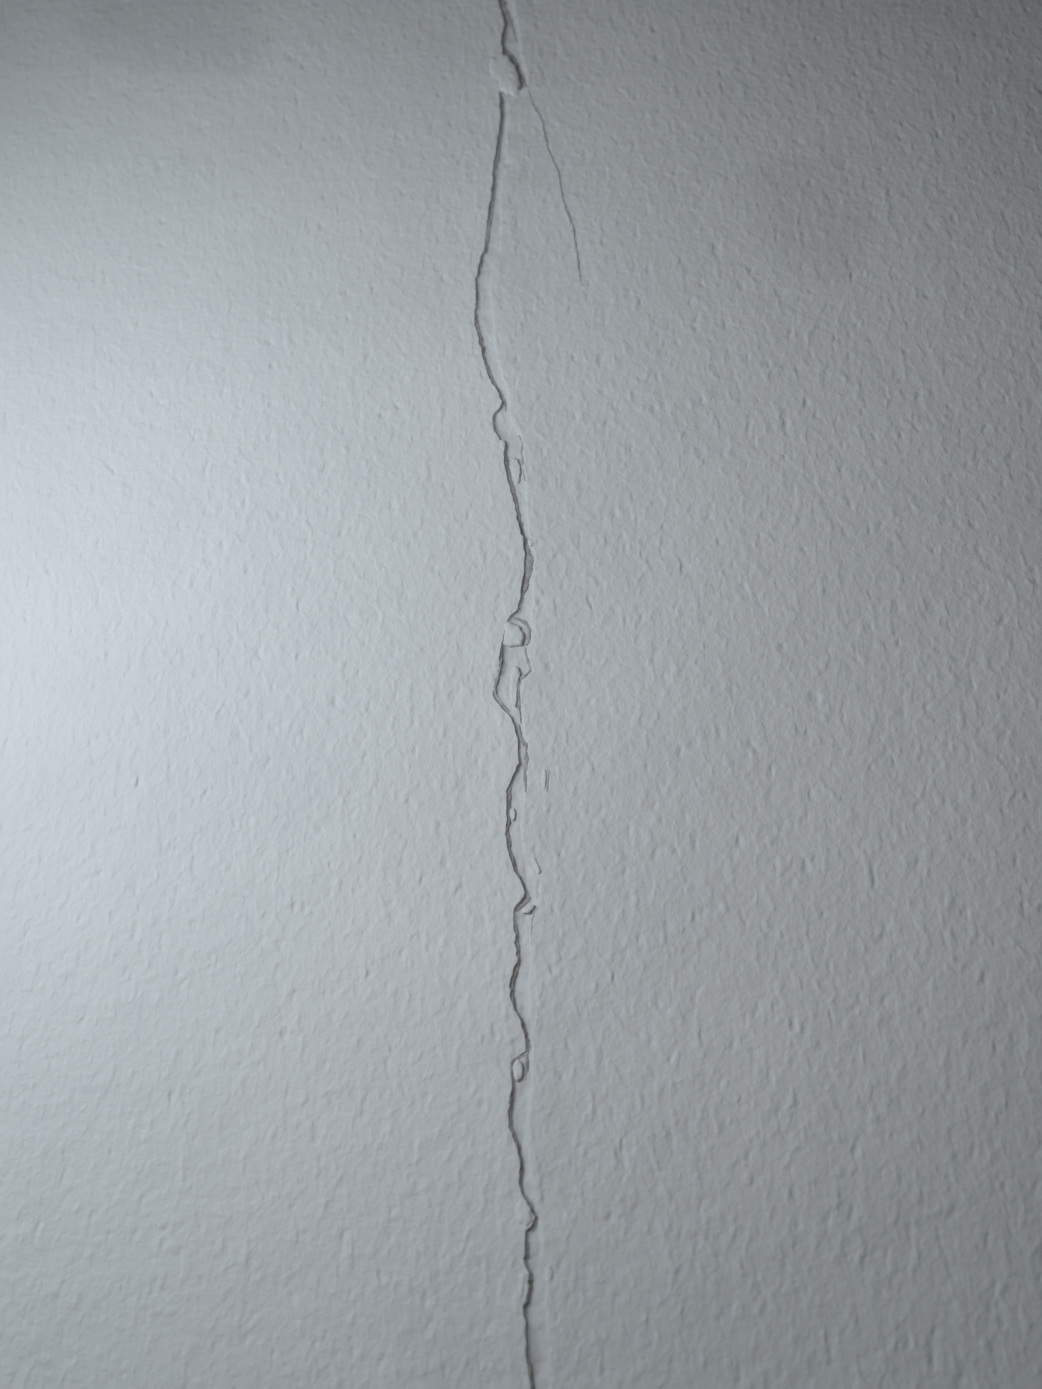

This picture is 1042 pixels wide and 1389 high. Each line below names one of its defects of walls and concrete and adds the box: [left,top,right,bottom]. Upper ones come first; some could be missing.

crack [474,0,581,1389]